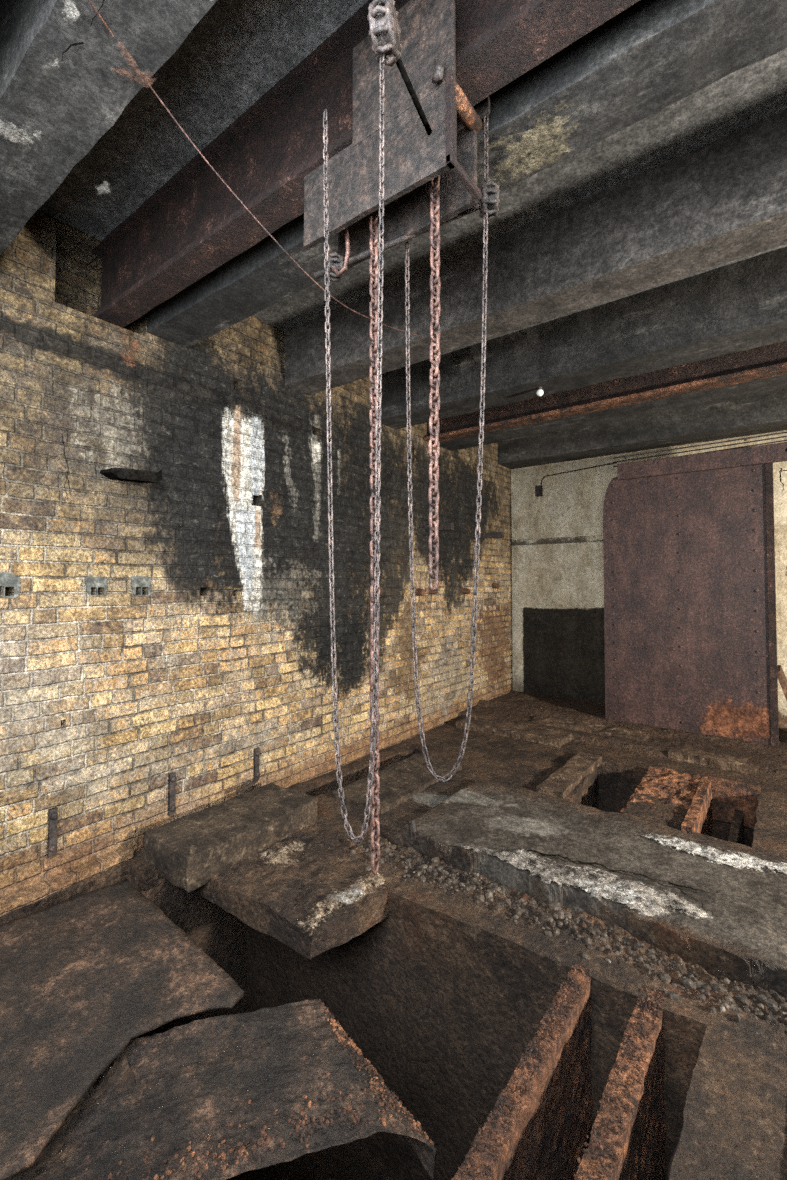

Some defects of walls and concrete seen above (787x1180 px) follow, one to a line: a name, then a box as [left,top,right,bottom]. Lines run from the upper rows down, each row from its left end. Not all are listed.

water stain [311,439,321,463]
water stain [222,406,265,616]
rust [701,699,770,741]
water stain [645,833,787,874]
crack [526,850,718,917]